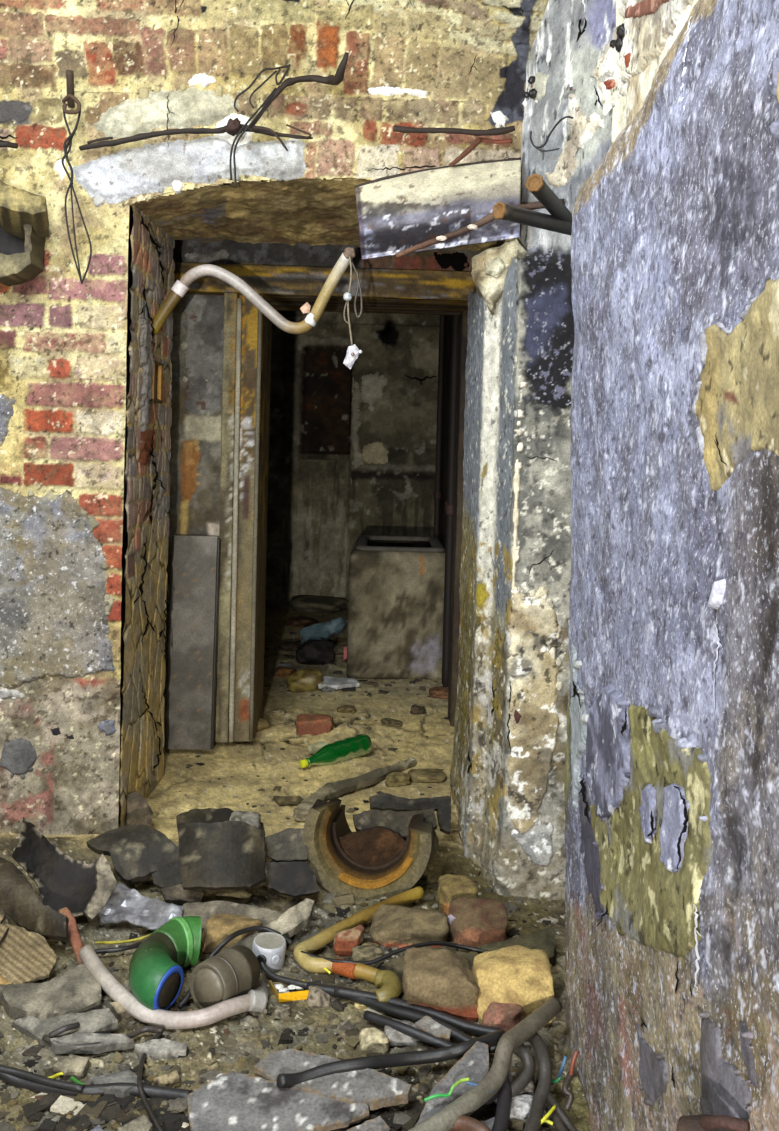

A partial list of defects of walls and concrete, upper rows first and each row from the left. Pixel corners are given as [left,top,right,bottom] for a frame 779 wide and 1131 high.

peeling [544,0,694,188]
spalling [770,120,779,140]
crack [138,210,167,349]
peeling [0,394,16,446]
peeling [692,278,779,491]
peeling [0,487,116,703]
crack [134,425,168,662]
peeling [708,579,726,611]
crack [138,685,162,769]
peeling [506,410,714,957]
peeling [636,1024,669,1106]